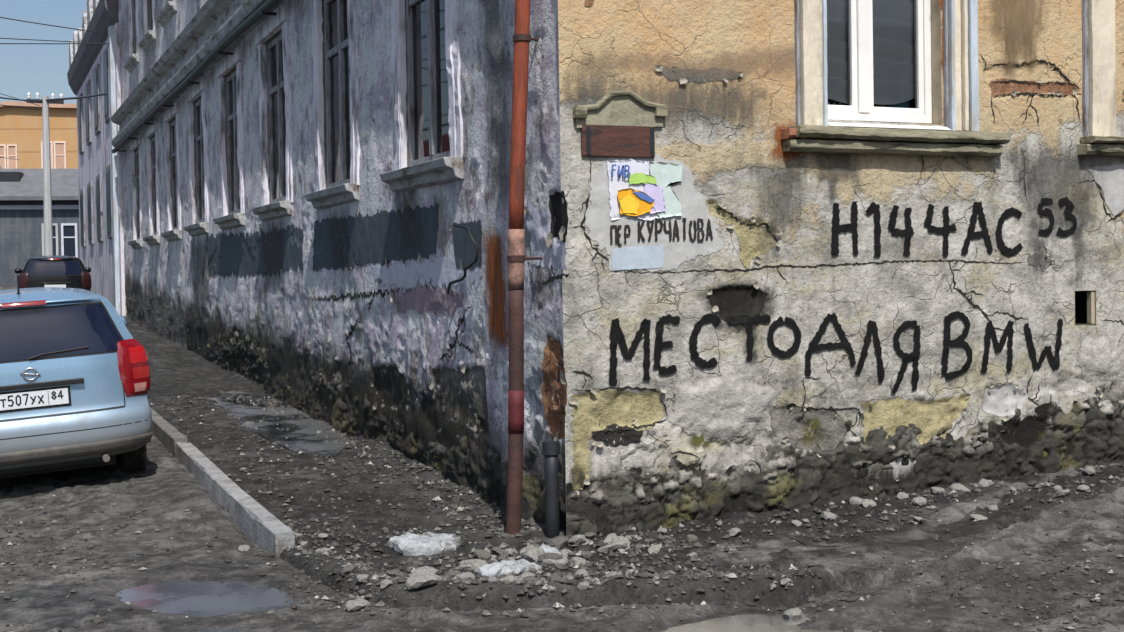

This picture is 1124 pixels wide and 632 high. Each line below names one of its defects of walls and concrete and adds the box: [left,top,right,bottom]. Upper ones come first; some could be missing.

damp [994,0,1042,73]
flaking render [990,78,1078,98]
damp [192,245,208,301]
rust [484,232,509,346]
crack [572,159,1047,330]
crack [1078,180,1124,222]
flaking render [1086,164,1124,216]
damp [186,318,489,464]
flaking render [542,334,667,495]
crack [555,331,667,427]
crack [776,376,861,437]
flaking render [769,384,1028,490]